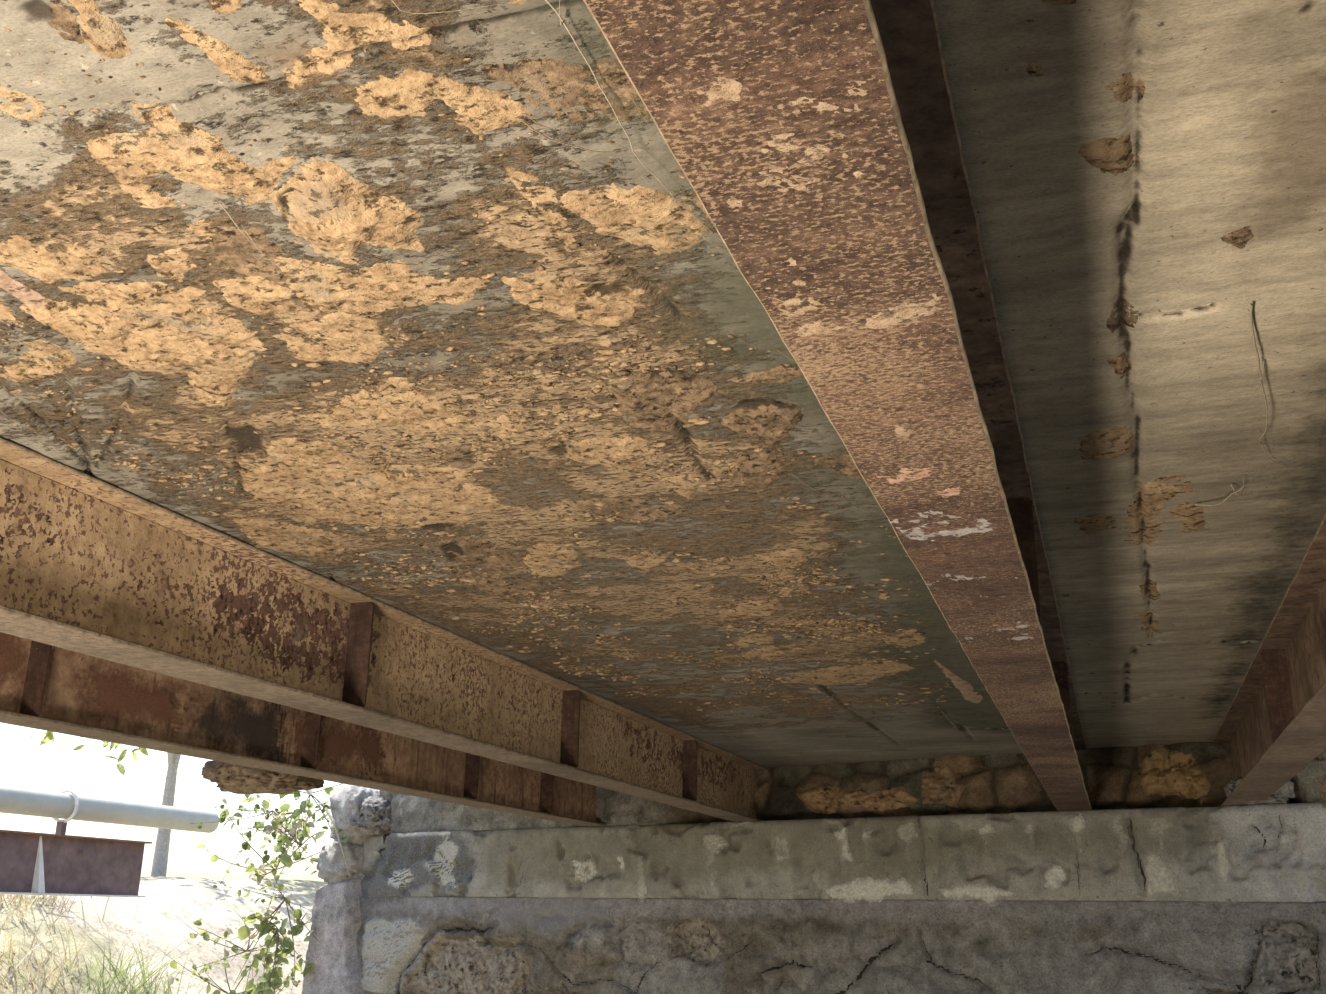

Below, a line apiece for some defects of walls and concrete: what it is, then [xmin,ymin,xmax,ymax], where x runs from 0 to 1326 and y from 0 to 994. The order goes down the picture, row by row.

spalling [165,0,433,89]
crack [181,0,582,102]
spalling [354,55,656,140]
spalling [0,218,650,407]
crack [1116,133,1152,703]
rust [0,461,92,575]
spalling [227,377,582,590]
rust [110,542,350,699]
rust [190,693,304,763]
rust [616,713,748,802]
crack [392,924,677,994]
crack [836,937,990,994]